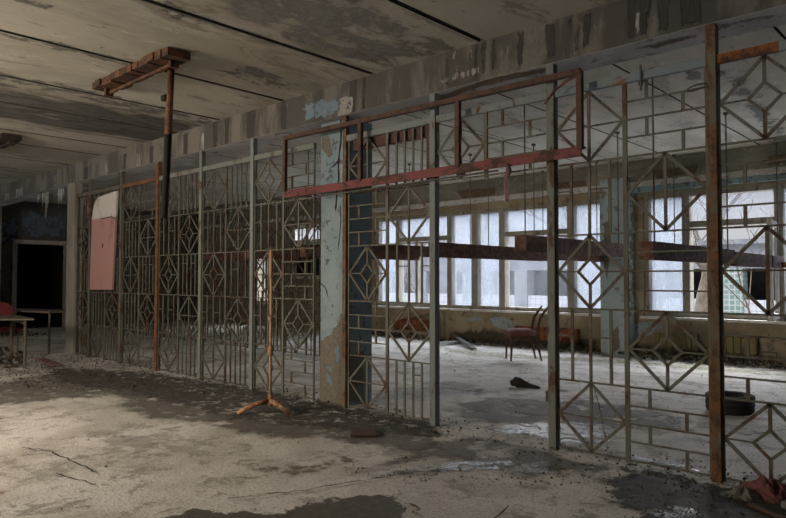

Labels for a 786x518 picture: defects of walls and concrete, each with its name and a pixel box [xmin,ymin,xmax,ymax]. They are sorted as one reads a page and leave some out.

water stain [225,0,496,85]
peeling [303,96,353,121]
water stain [0,373,438,452]
water stain [165,495,420,518]